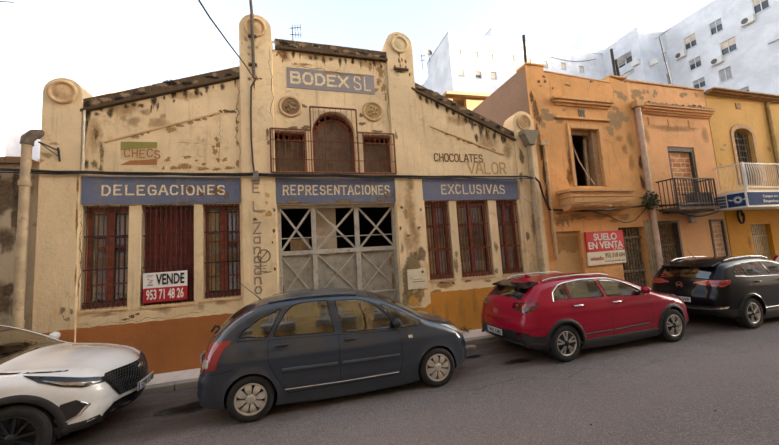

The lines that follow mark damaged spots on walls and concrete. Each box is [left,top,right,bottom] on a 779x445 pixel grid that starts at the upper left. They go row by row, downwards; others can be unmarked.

leakage [276,51,382,68]
leakage [85,84,225,170]
leakage [419,95,506,146]
spalling [529,76,571,204]
peeling [606,83,664,140]
peeling [403,247,472,305]